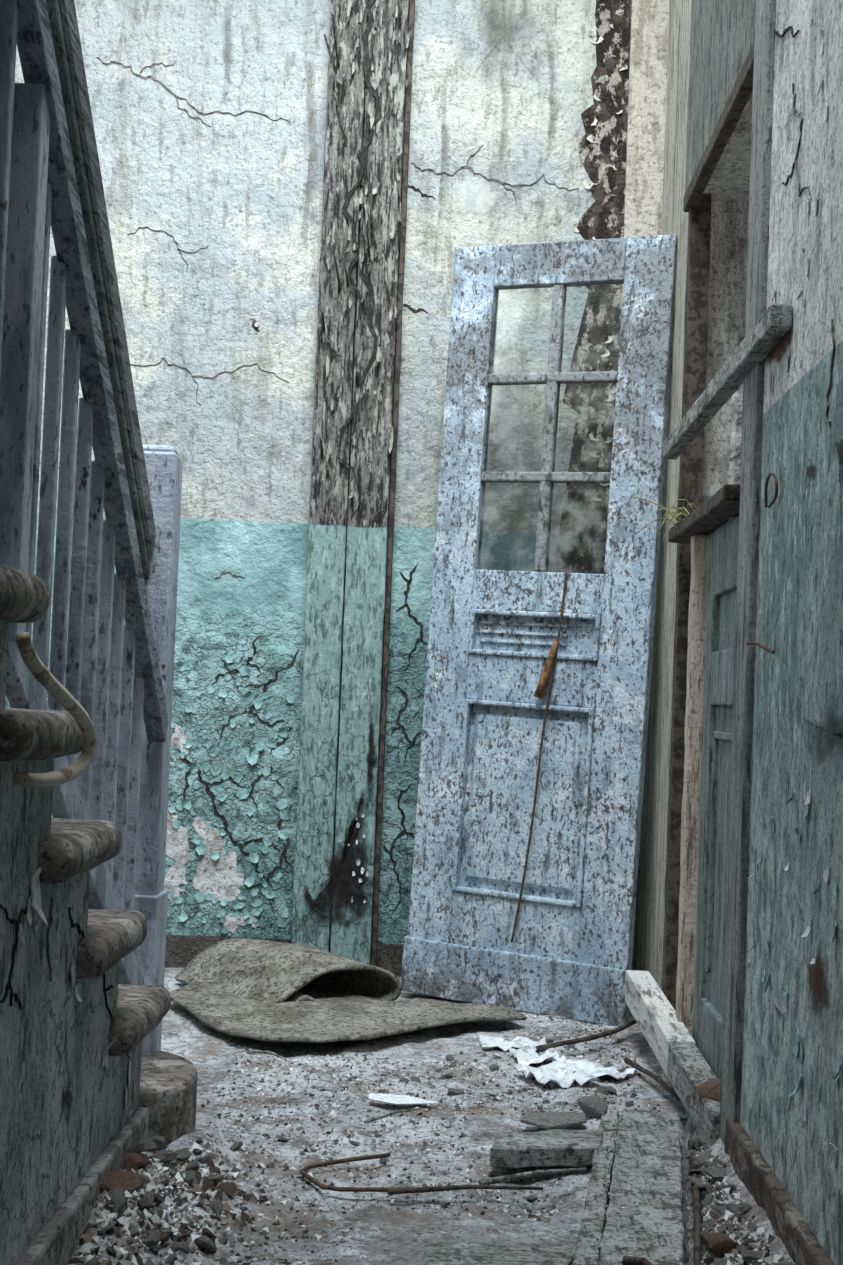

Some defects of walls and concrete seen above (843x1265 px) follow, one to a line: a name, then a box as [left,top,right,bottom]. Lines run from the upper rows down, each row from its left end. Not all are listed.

crack [95,57,290,126]
crack [408,145,579,205]
flaking render [573,0,632,240]
flaking render [553,284,622,574]
peeling [164,655,292,934]
crack [174,636,299,909]
water stain [302,705,375,927]
crack [384,563,428,913]
crack [0,889,85,1009]
crack [103,973,115,1020]
corrosion [807,959,827,1017]